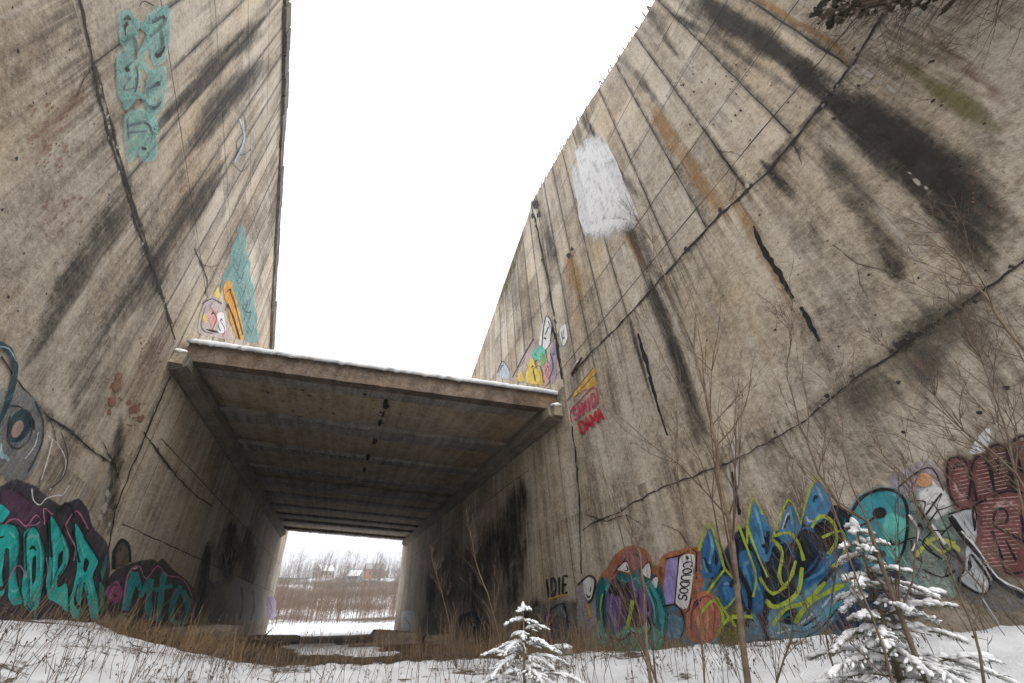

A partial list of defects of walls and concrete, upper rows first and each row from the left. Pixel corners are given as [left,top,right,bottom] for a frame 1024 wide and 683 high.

damp [25,202,125,366]
crack [77,0,176,340]
damp [112,163,224,320]
damp [152,19,265,148]
crack [531,201,557,324]
crack [571,6,888,376]
damp [678,0,1007,277]
damp [83,422,124,528]
crack [571,260,1024,574]
damp [427,481,542,647]